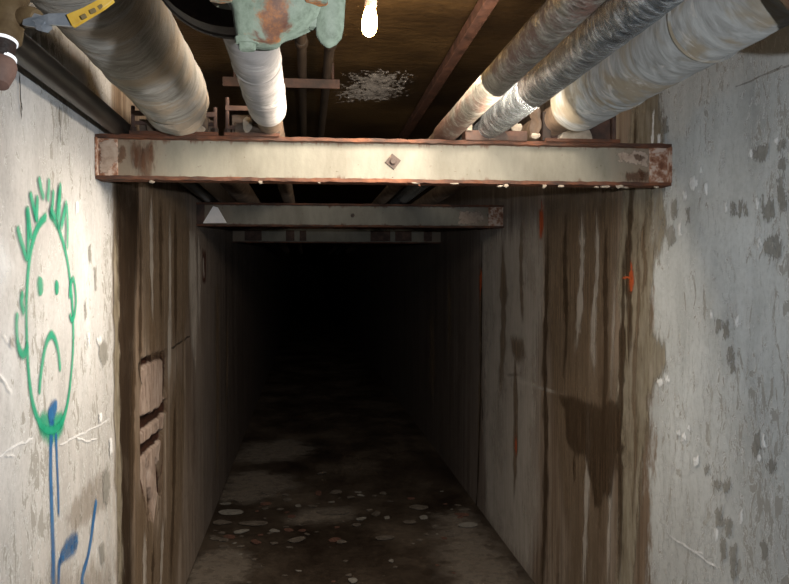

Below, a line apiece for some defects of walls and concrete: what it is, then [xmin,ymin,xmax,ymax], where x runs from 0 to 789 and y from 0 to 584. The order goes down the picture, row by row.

leakage [628,94,663,144]
corrosion [131,140,153,176]
peeling [756,234,785,260]
peeling [710,310,739,374]
leakage [478,187,667,584]
spalling [139,335,190,548]
peeling [693,455,732,494]
peeling [752,432,777,474]
peeling [714,507,743,583]